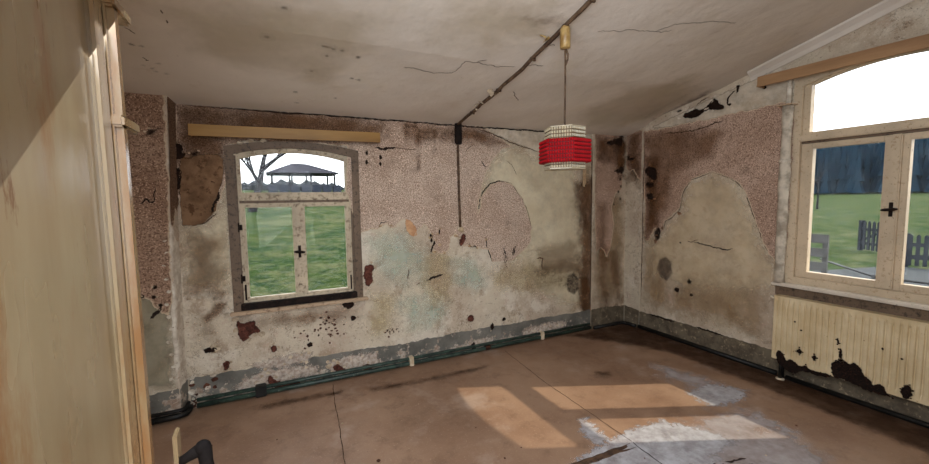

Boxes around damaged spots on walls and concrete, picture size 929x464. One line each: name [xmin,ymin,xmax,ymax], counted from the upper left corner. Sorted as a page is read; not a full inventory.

peeling [654,79,794,128]
spalling [176,143,200,189]
spalling [645,164,660,202]
peeling [478,128,586,302]
peeling [654,173,770,297]
damp [576,324,929,451]
corrosion [776,338,914,399]